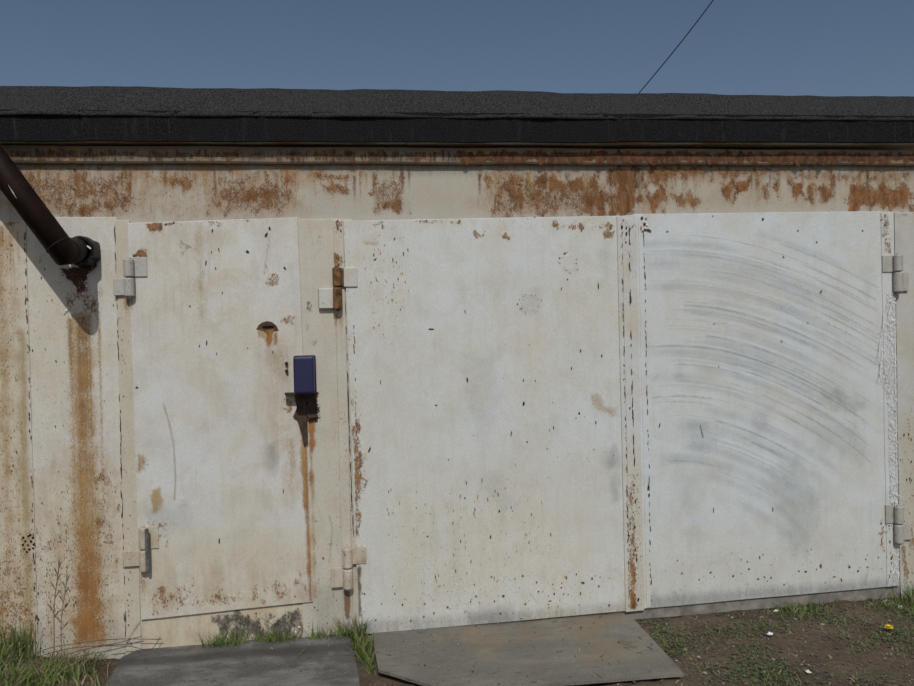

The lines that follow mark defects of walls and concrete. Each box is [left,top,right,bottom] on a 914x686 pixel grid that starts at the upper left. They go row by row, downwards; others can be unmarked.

rust [7,148,914,253]
rust [44,260,120,644]
rust [352,421,366,535]
rust [628,483,639,608]
water stain [213,608,303,642]